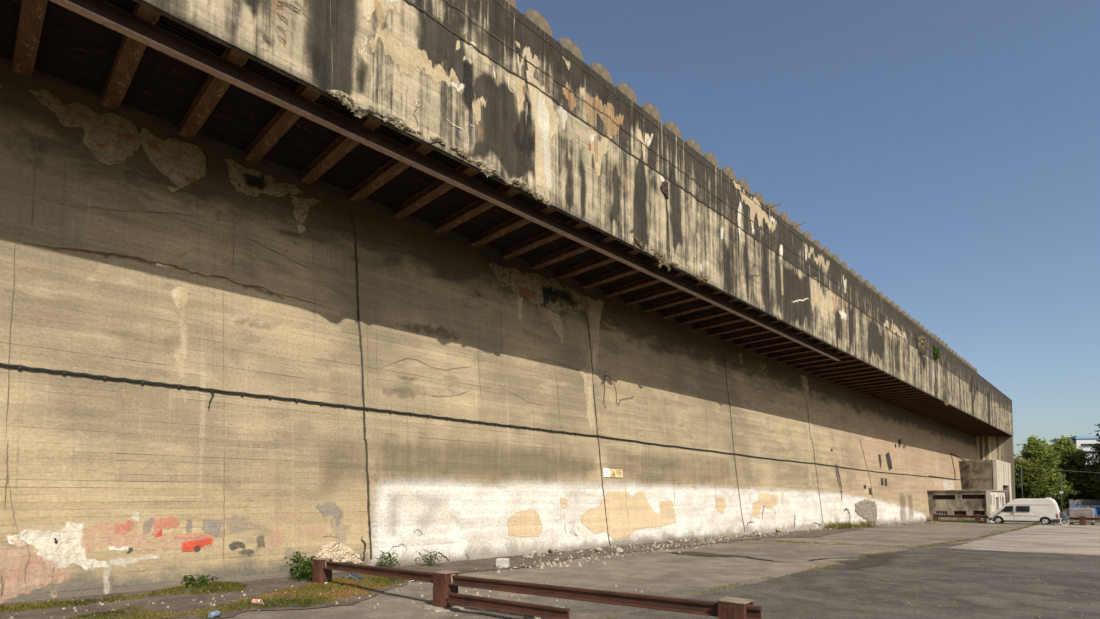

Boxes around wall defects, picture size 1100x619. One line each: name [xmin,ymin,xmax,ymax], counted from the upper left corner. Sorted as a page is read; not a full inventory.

flaking render [29,89,206,193]
damp [306,0,653,251]
flaking render [224,158,324,233]
damp [660,169,682,252]
damp [721,228,732,293]
damp [733,181,854,346]
damp [868,318,907,371]